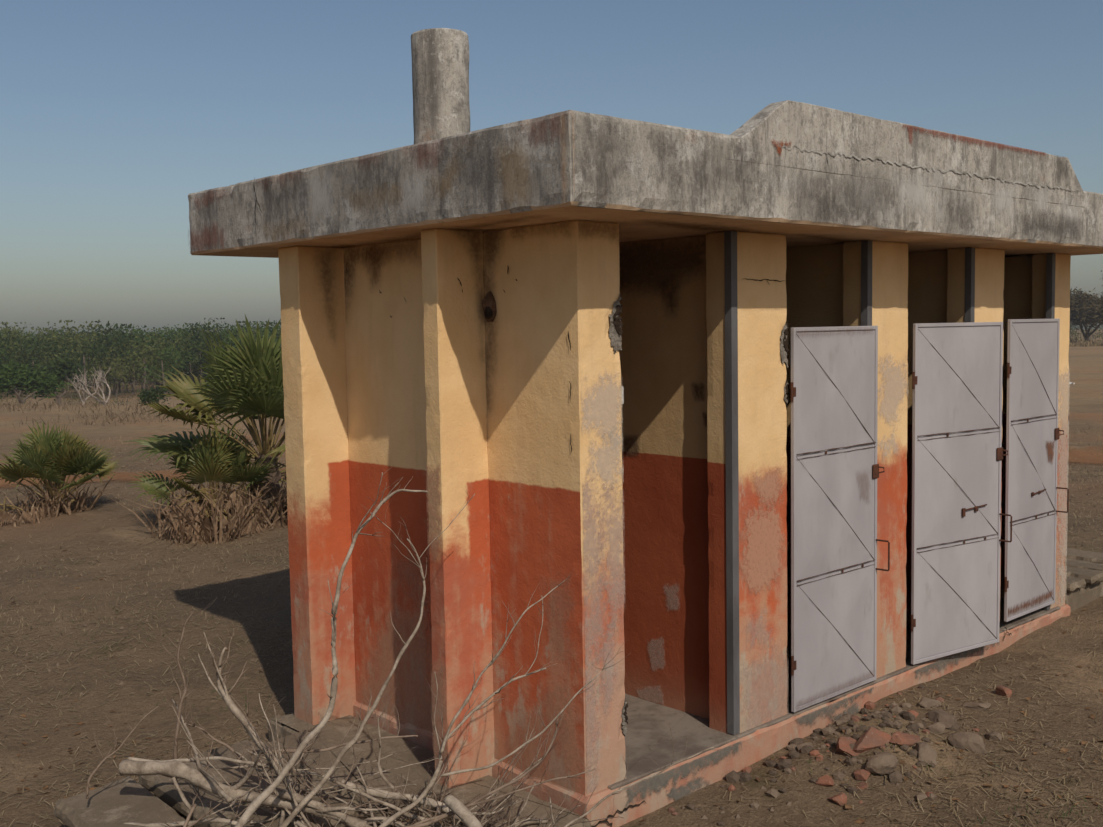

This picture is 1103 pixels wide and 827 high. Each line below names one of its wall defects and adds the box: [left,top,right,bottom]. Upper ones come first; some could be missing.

spalling [609,294,623,356]
peeling [583,375,639,756]
crack [591,800,646,827]